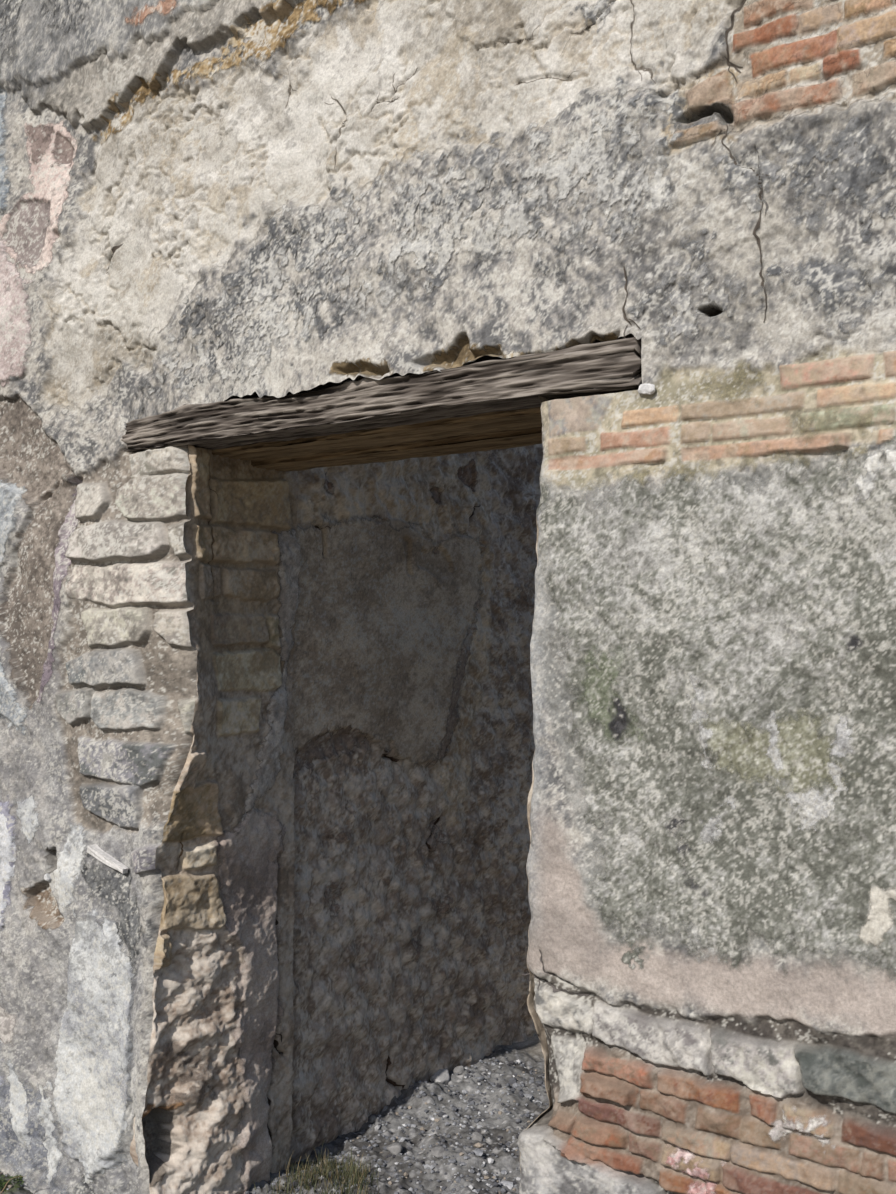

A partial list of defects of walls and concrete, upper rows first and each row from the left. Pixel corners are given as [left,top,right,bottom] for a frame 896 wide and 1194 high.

crack [725,0,746,82]
crack [711,125,770,323]
flaking render [0,0,896,735]
peeling [214,514,484,1194]
water stain [769,1109,829,1144]